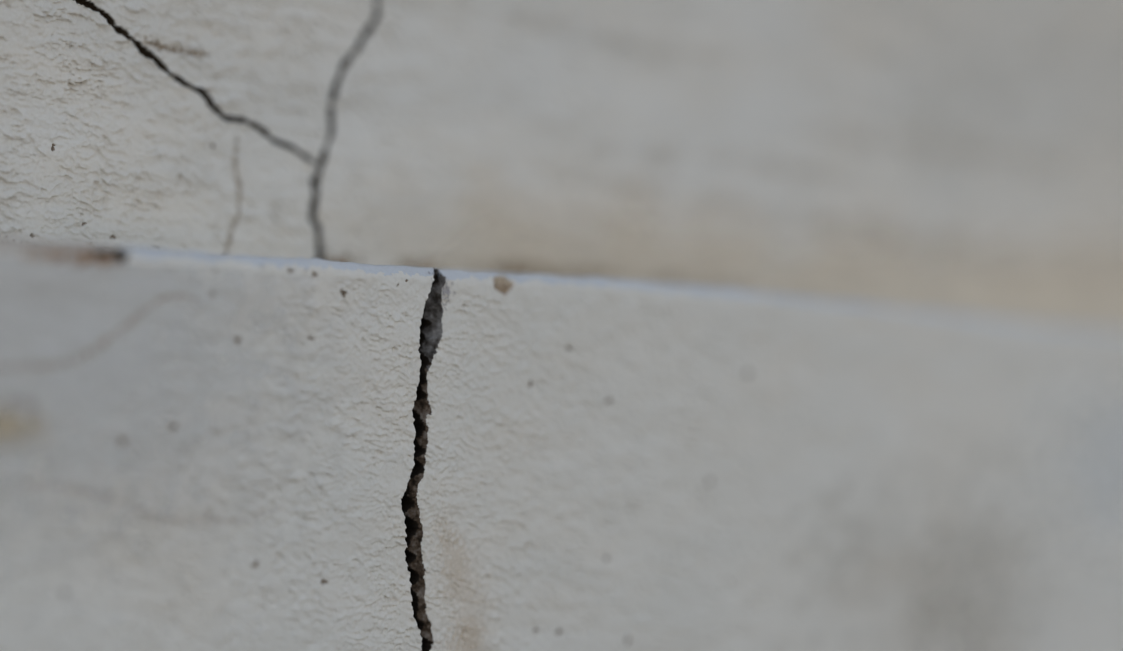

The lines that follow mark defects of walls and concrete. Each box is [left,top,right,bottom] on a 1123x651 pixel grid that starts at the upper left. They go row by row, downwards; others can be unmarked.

crack [73,0,381,260]
crack [401,268,446,651]